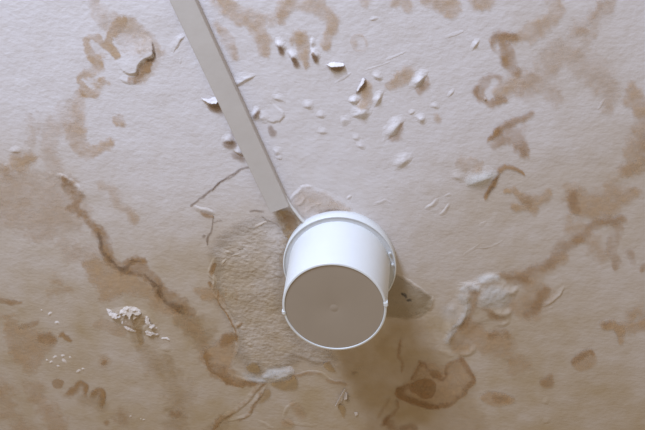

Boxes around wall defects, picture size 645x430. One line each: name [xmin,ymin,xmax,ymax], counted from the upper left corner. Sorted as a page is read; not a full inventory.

damp [103,35,120,59]
peeling [117,33,155,85]
damp [499,34,517,66]
damp [87,247,187,313]
spalling [386,276,430,317]
damp [203,335,255,387]